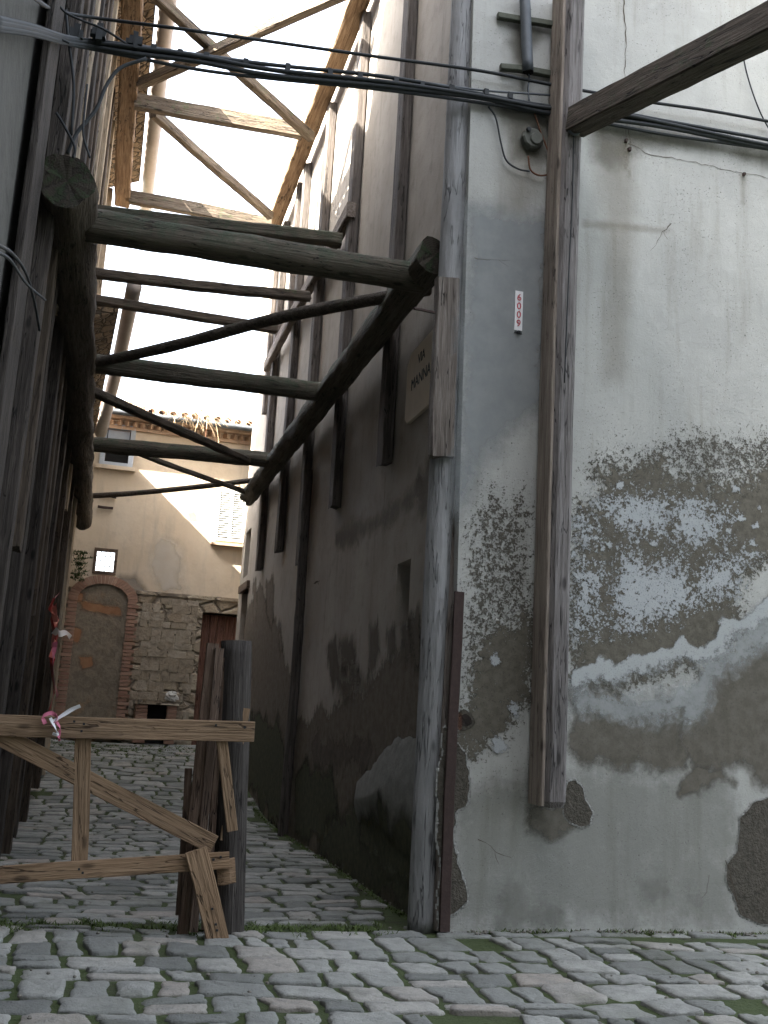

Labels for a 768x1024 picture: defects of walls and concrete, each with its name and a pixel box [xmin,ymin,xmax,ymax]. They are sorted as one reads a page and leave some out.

crack [621,0,629,73]
leakage [243,575,421,915]
peeling [435,471,536,929]
flaking render [562,778,595,830]
peeling [568,418,768,706]
flaking render [725,797,768,927]